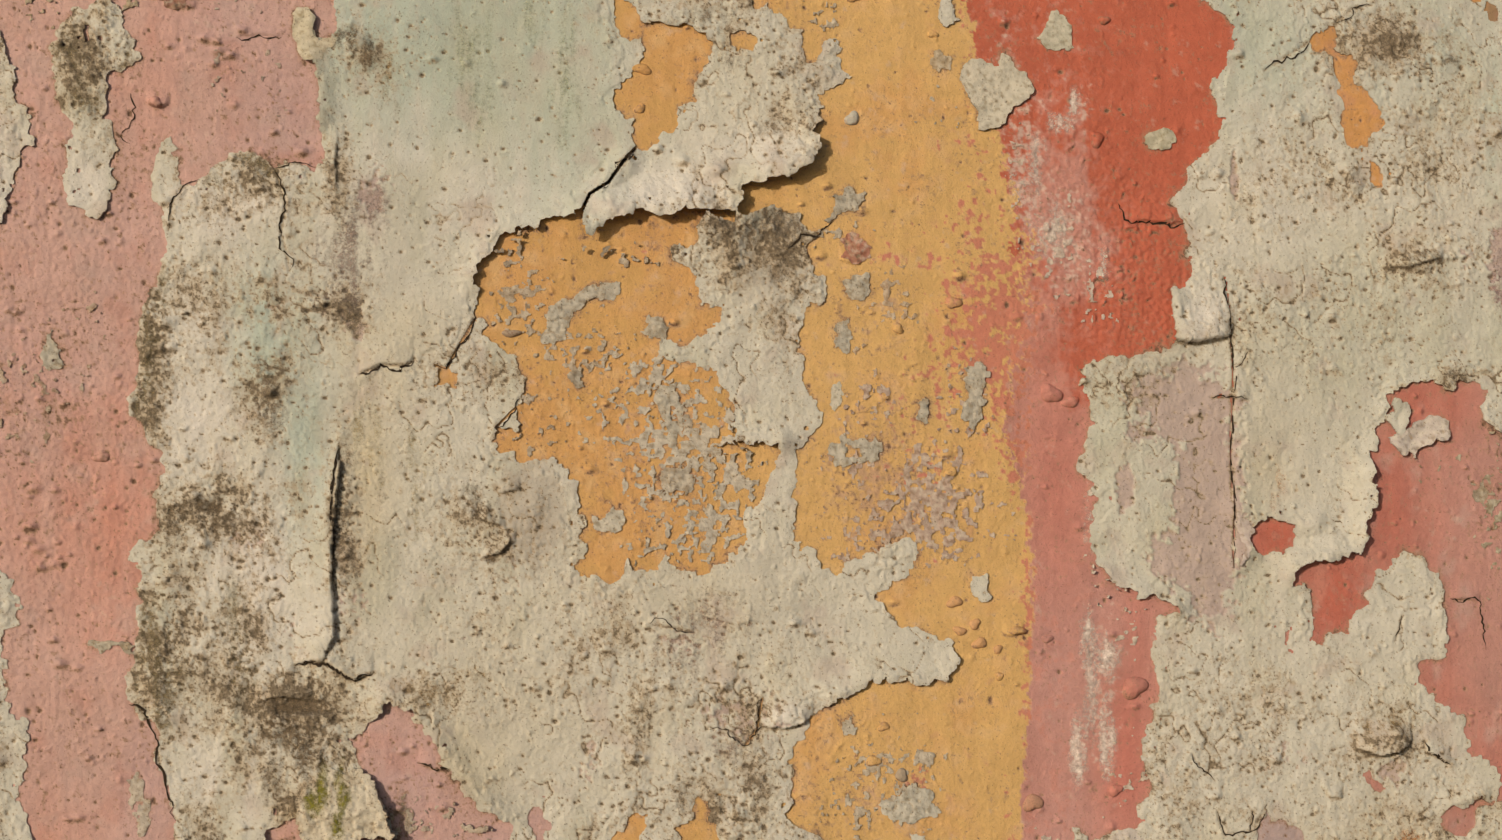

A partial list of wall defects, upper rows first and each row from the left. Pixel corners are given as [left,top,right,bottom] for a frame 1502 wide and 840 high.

peeling [0,30,35,223]
peeling [48,0,142,219]
peeling [960,53,1034,131]
peeling [1037,10,1074,51]
crack [329,449,339,577]
damp [332,451,360,584]
peeling [124,0,960,840]
crack [1213,278,1248,561]
peeling [1072,0,1502,840]
peeling [0,570,33,840]
damp [304,766,350,836]
crack [295,660,371,682]